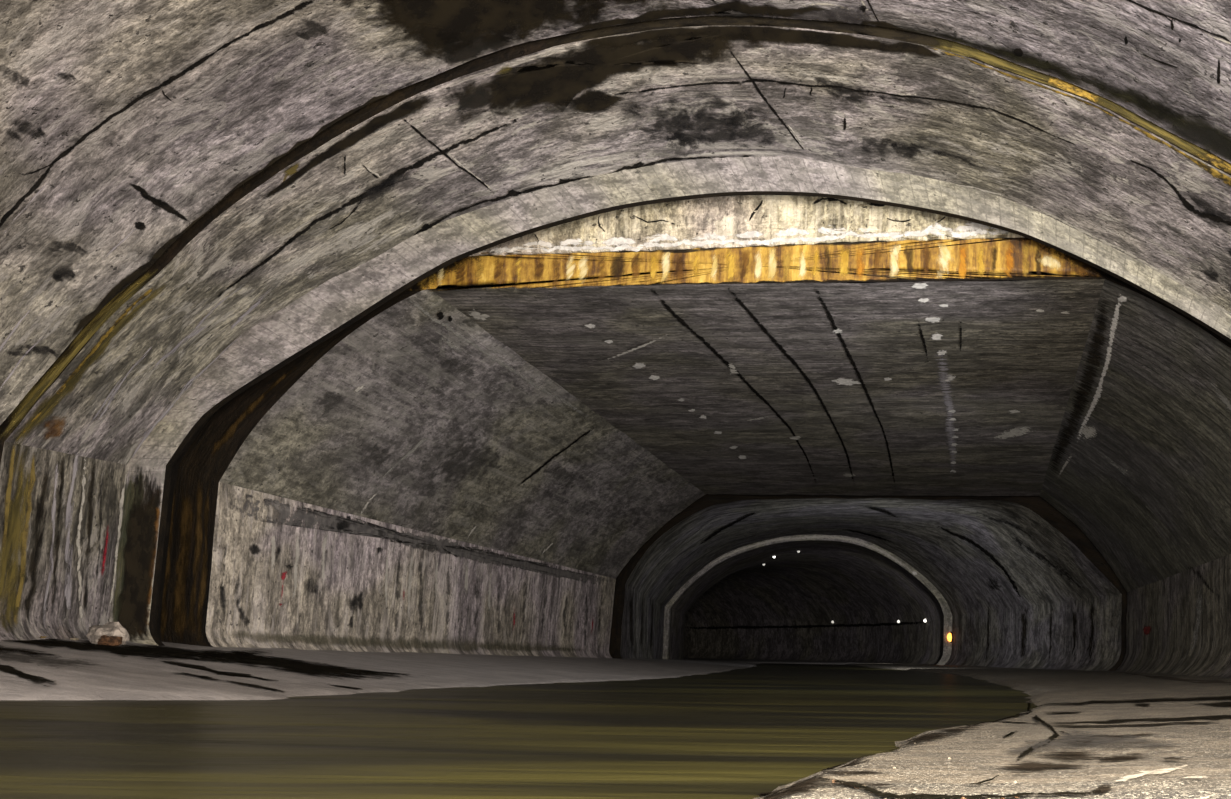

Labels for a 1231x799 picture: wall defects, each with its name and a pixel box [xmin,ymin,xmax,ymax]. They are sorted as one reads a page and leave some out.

leakage [296,21,326,39]
crack [0,0,313,227]
leakage [563,0,1231,160]
leakage [862,140,976,166]
corrosion [930,36,1231,186]
leakage [607,240,884,253]
corrosion [422,238,1093,291]
crack [654,291,816,482]
crack [728,286,895,542]
leakage [994,409,1033,439]
crack [937,526,1020,597]
crack [814,700,1100,799]